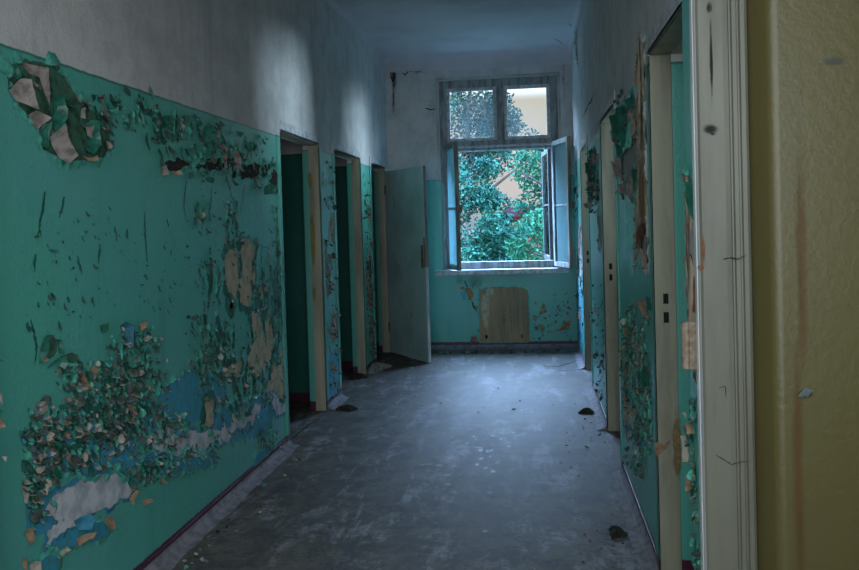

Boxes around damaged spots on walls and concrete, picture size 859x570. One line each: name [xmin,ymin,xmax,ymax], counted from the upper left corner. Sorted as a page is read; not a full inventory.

peeling [0,51,115,171]
peeling [18,196,287,570]
flaking render [477,142,605,404]
spalling [609,27,650,277]
peeling [618,296,701,570]
spalling [681,165,696,322]